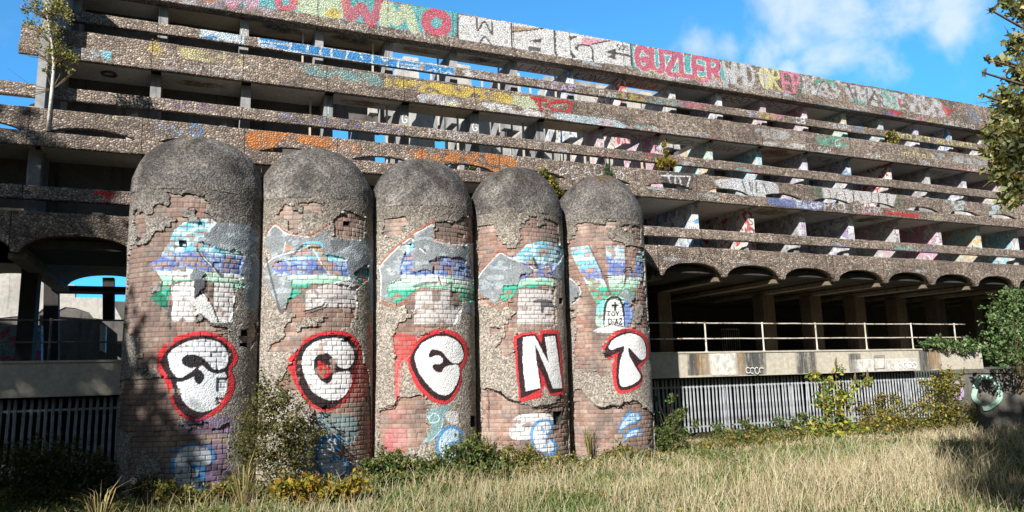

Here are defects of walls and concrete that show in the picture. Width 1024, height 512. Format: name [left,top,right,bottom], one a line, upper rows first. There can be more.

flaking render [117,192,259,495]
flaking render [277,202,367,240]
flaking render [268,276,431,467]
flaking render [382,216,411,261]
flaking render [391,216,648,377]